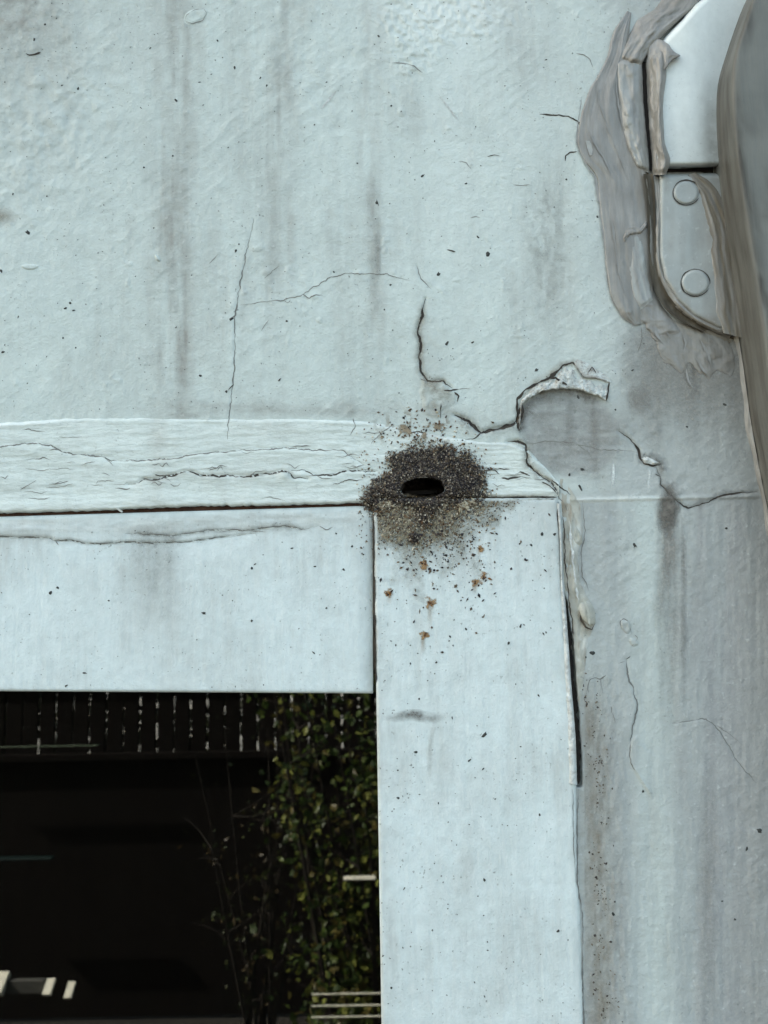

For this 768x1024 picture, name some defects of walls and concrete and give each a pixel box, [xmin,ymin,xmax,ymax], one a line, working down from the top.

peeling [516,359,612,431]
crack [0,220,634,649]
spalling [377,478,477,514]
crack [656,470,751,509]
crack [587,657,638,769]